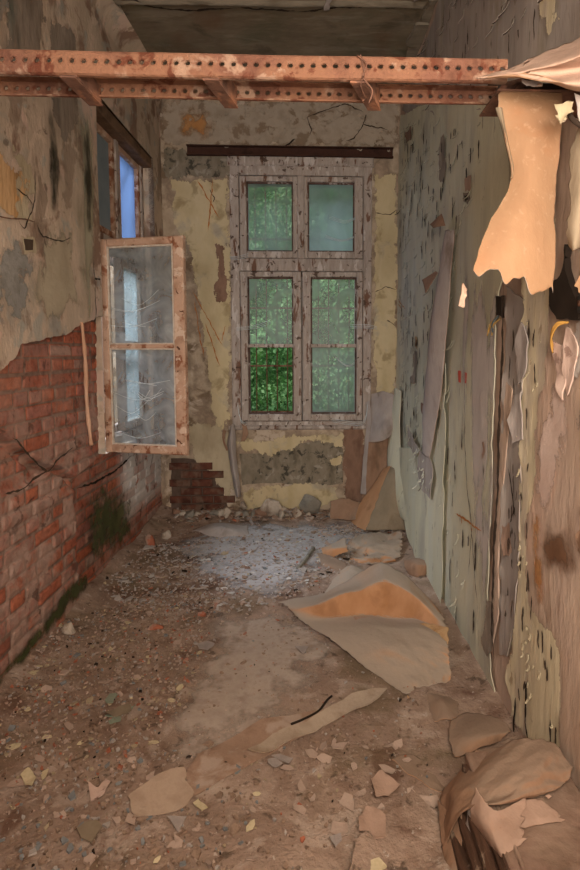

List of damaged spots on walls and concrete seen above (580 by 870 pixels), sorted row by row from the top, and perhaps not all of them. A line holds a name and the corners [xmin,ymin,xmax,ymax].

peeling [6,0,76,63]
peeling [416,0,580,81]
peeling [49,88,79,149]
crack [285,103,387,146]
peeling [0,145,36,223]
flaking render [21,236,37,255]
peeling [160,83,580,747]
crack [6,437,72,495]
crack [79,458,129,488]
flaking render [0,319,365,680]